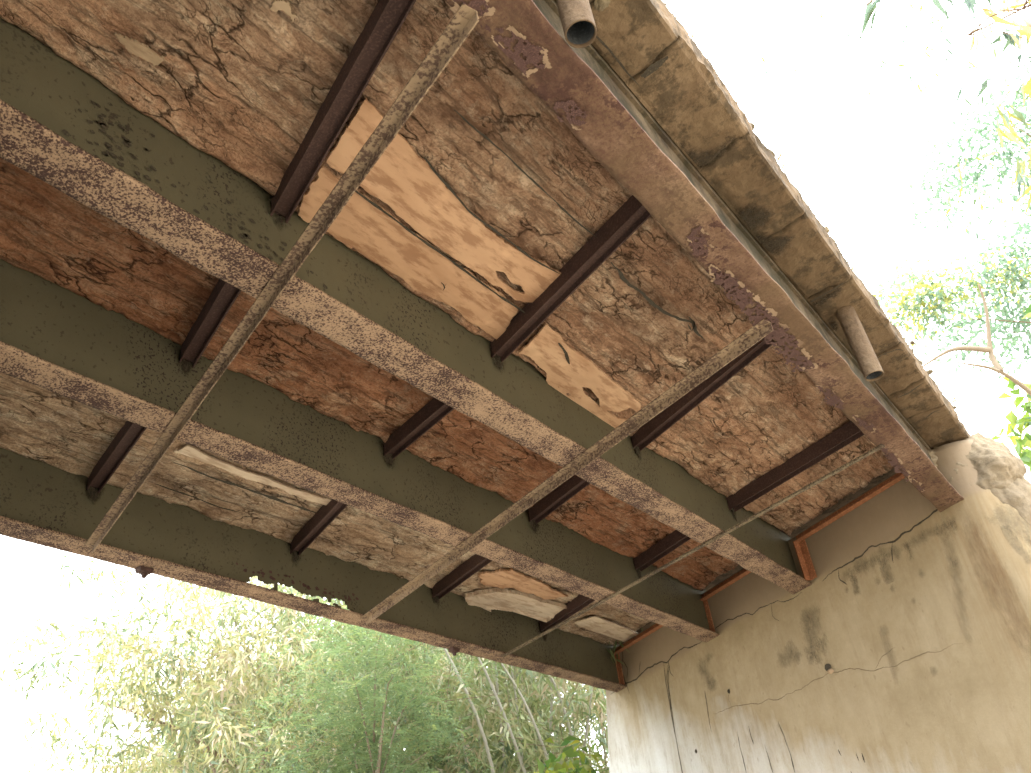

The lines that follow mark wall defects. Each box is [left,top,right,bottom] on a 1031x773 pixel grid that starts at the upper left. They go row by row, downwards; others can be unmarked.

corrosion [450,0,552,78]
peeling [298,98,384,223]
peeling [327,133,561,340]
corrosion [687,226,818,372]
peeling [519,323,641,428]
peeling [174,444,331,505]
crack [825,509,938,585]
peeling [464,588,567,623]
peeling [574,616,639,642]
crack [610,592,802,773]
crack [705,644,953,728]